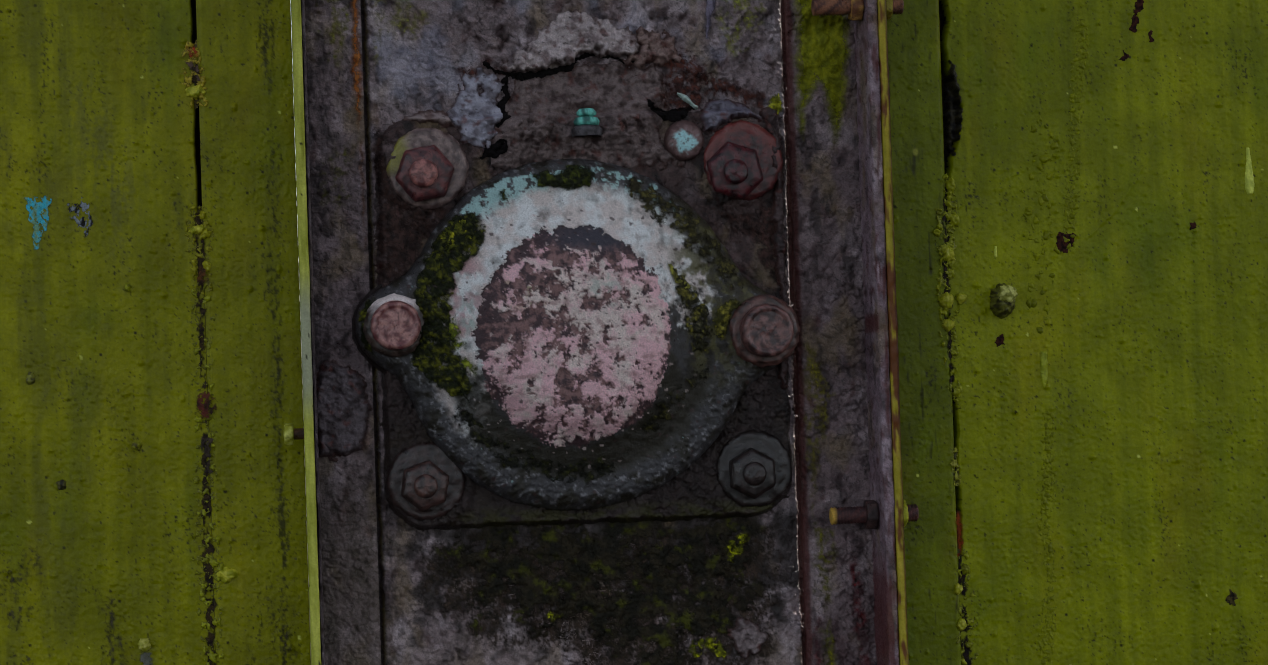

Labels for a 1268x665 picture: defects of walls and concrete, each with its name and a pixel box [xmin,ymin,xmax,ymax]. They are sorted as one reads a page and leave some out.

peeling [402,9,682,152]
rust [456,48,765,173]
rust [361,127,465,285]
rust [195,391,217,419]
rust [200,437,215,474]
water stain [420,525,786,665]